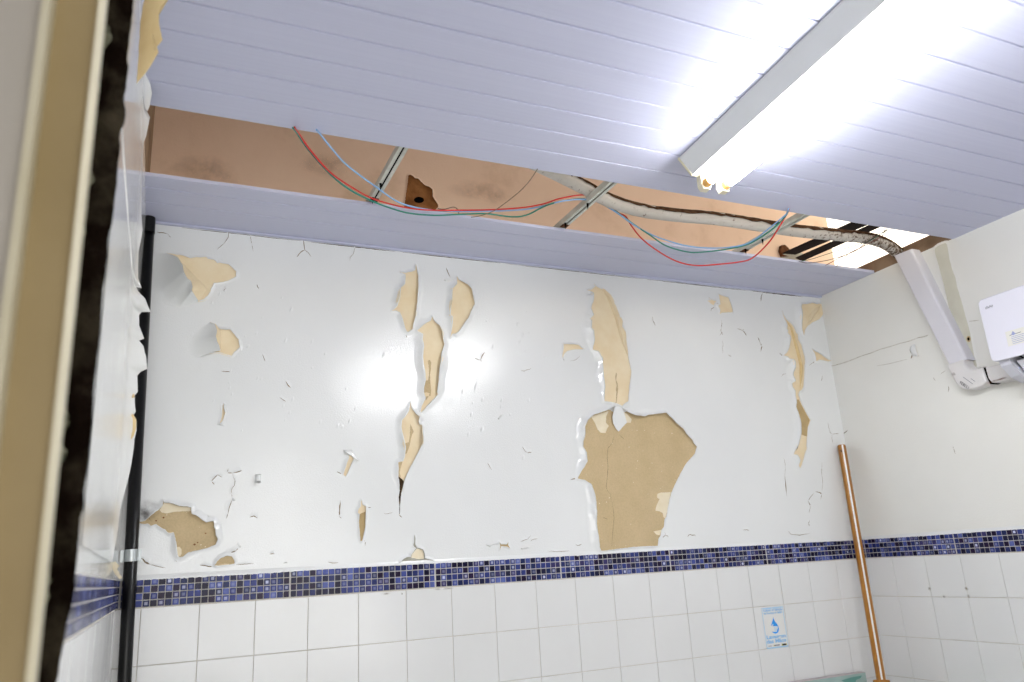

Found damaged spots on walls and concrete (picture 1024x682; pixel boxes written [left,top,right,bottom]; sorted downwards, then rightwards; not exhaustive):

spalling [37,0,243,682]
peeling [354,497,369,544]
peeling [389,262,480,516]
peeling [560,282,700,553]
peeling [781,300,831,471]